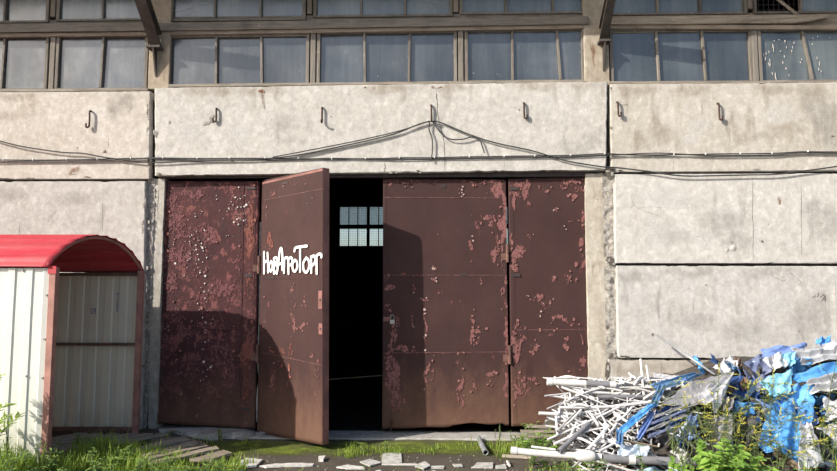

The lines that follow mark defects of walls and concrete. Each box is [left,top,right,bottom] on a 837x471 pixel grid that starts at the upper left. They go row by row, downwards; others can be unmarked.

peeling [160,182,256,360]
peeling [383,273,434,412]
peeling [456,178,586,408]